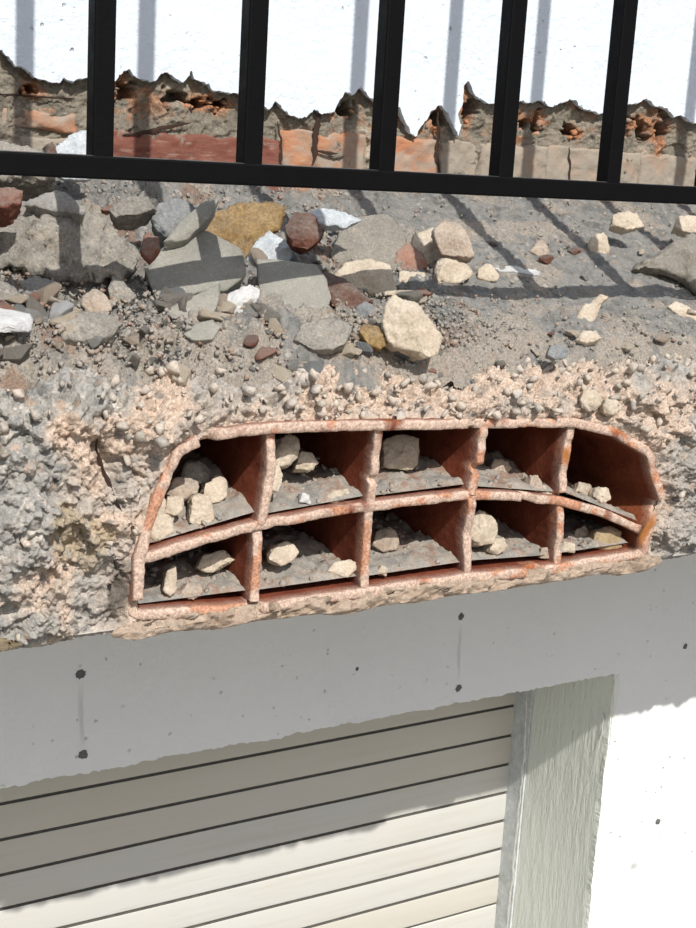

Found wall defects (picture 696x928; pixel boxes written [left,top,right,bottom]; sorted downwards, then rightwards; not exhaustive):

flaking render [0,52,87,149]
flaking render [113,70,238,162]
flaking render [262,89,373,169]
flaking render [394,84,494,175]
flaking render [513,100,603,181]
flaking render [620,100,696,186]
spalling [108,276,137,309]
spalling [165,283,221,324]
spalling [358,324,388,352]
spalling [575,294,609,346]
spalling [0,353,696,652]